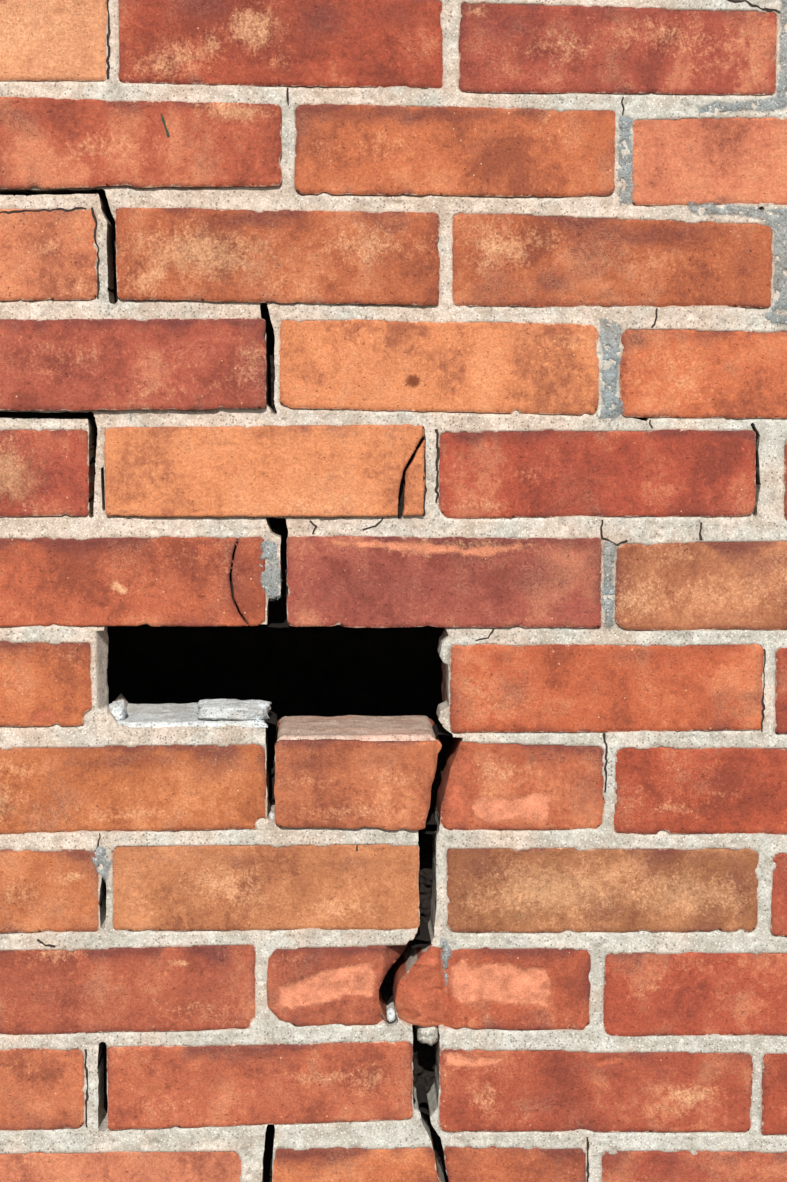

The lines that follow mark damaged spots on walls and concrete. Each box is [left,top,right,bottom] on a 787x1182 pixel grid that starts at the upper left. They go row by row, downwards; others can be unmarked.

crack [0,189,118,303]
crack [262,305,277,414]
crack [0,411,98,515]
crack [362,427,440,531]
crack [230,517,318,628]
spalling [108,699,127,721]
crack [264,710,277,805]
crack [759,649,767,732]
crack [379,724,453,1006]
crack [84,1042,108,1127]
crack [262,1124,275,1182]
crack [412,1025,449,1182]